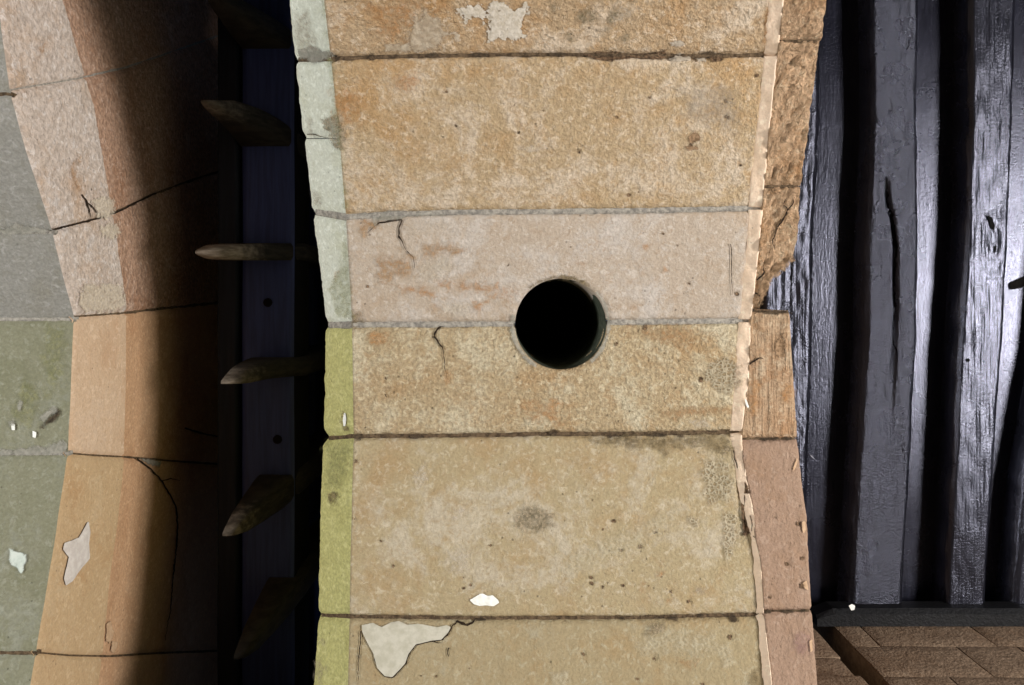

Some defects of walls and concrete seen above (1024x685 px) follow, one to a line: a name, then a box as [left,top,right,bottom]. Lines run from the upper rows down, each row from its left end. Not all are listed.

flaking render [385,0,530,54]
crack [53,193,156,230]
crack [368,219,415,268]
crack [434,326,447,375]
flaking render [63,522,90,585]
crack [137,458,180,640]
flaking render [362,621,450,677]